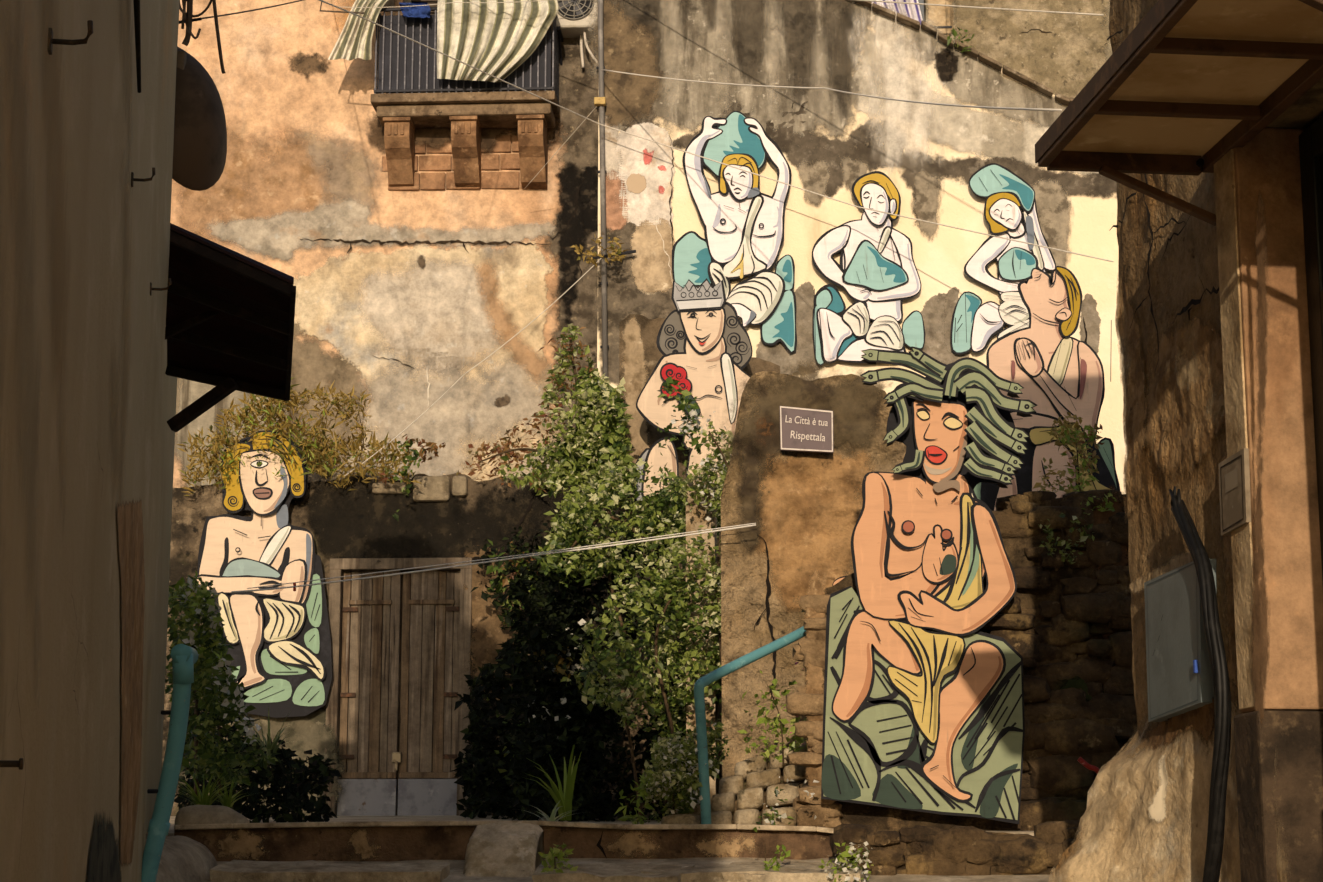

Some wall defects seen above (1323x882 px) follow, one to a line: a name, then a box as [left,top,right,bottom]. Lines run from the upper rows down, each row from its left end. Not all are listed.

damp [367,112,385,151]
damp [415,128,451,148]
damp [481,128,518,154]
crack [300,176,588,281]
damp [545,0,1117,442]
flaking render [293,240,561,481]